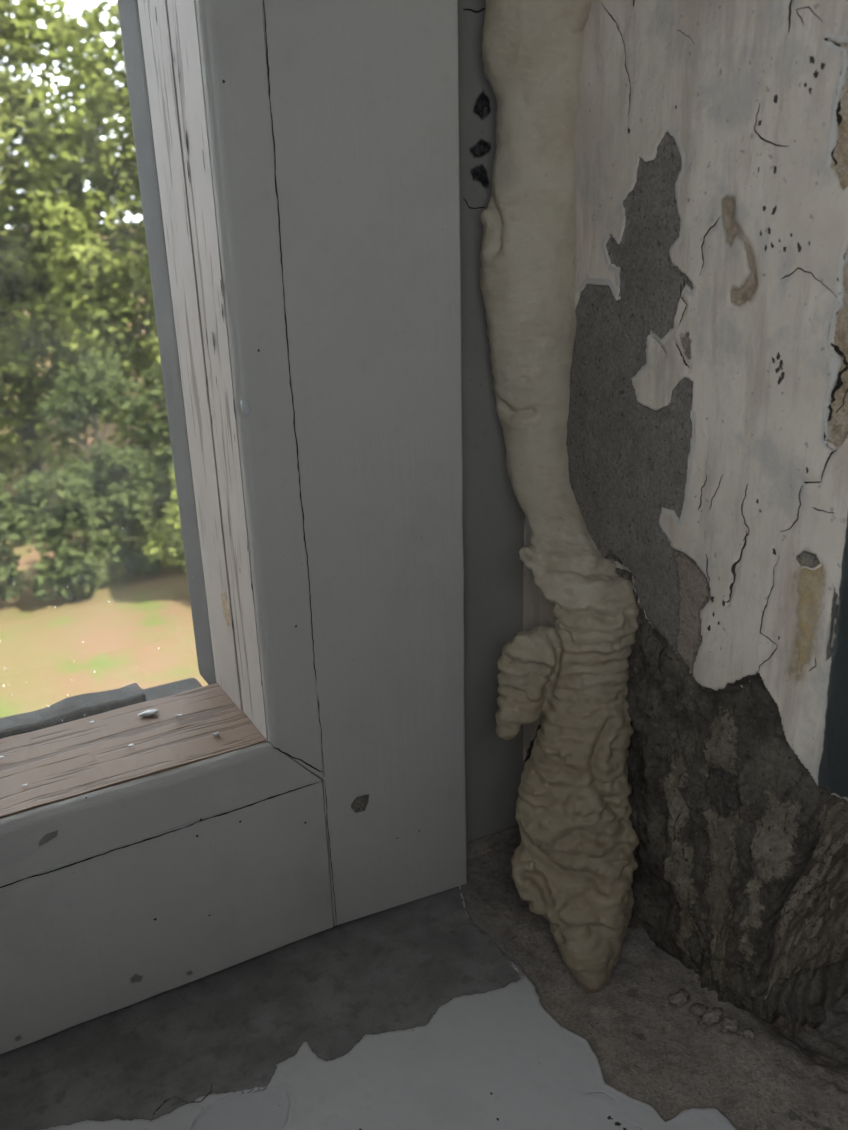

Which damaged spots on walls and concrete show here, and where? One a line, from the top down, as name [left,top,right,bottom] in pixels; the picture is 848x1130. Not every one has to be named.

crack [788,0,823,33]
crack [602,5,631,113]
peeling [804,56,825,94]
crack [754,103,788,147]
crack [656,217,720,368]
crack [781,267,835,295]
flaking render [566,126,848,1035]
crack [758,450,837,672]
peeling [351,794,369,813]
peeling [0,837,848,1130]
crack [151,1082,214,1121]